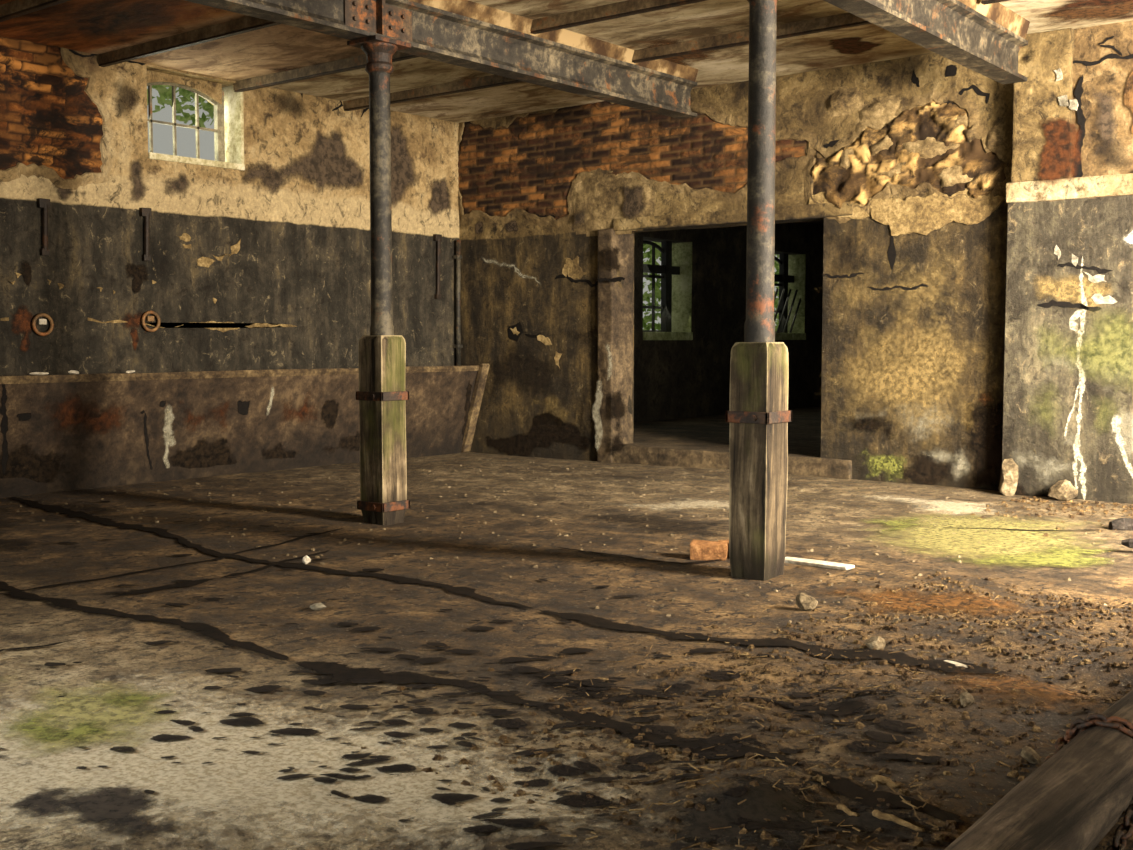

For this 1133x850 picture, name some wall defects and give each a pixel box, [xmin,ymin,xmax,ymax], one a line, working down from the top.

flaking render [0,36,113,190]
flaking render [458,101,748,229]
corrosion [830,37,881,54]
flaking render [775,65,1011,236]
peeling [1058,95,1078,111]
crack [1073,36,1133,178]
flaking render [1124,71,1133,134]
peeling [141,321,298,332]
crack [945,525,1072,533]
crack [0,381,1011,827]